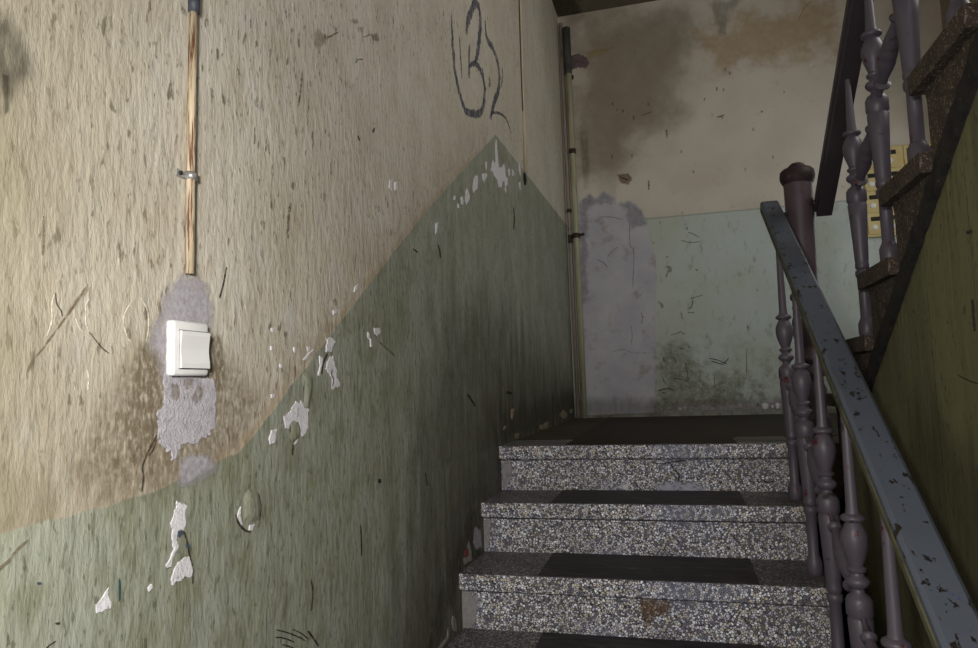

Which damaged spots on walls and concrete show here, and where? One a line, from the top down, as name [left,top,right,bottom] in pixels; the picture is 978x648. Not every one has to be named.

peeling [453,140,521,208]
peeling [293,337,340,389]
peeling [269,400,309,455]
damp [142,435,157,491]
peeling [165,501,194,585]